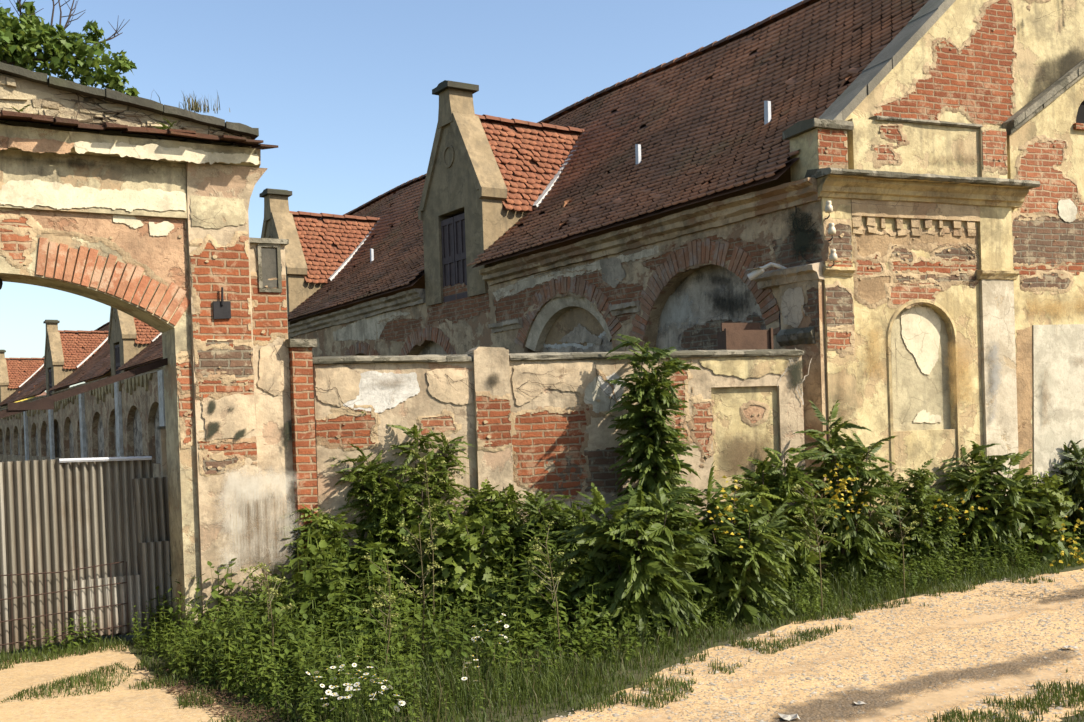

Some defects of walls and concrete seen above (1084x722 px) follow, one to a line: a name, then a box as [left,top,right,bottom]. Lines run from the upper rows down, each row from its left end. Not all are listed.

spalling [0,135,74,154]
flaking render [870,0,1084,296]
spalling [0,204,290,477]
flaking render [315,364,381,451]
crack [516,369,624,416]
flaking render [375,216,979,504]
water stain [709,293,748,316]